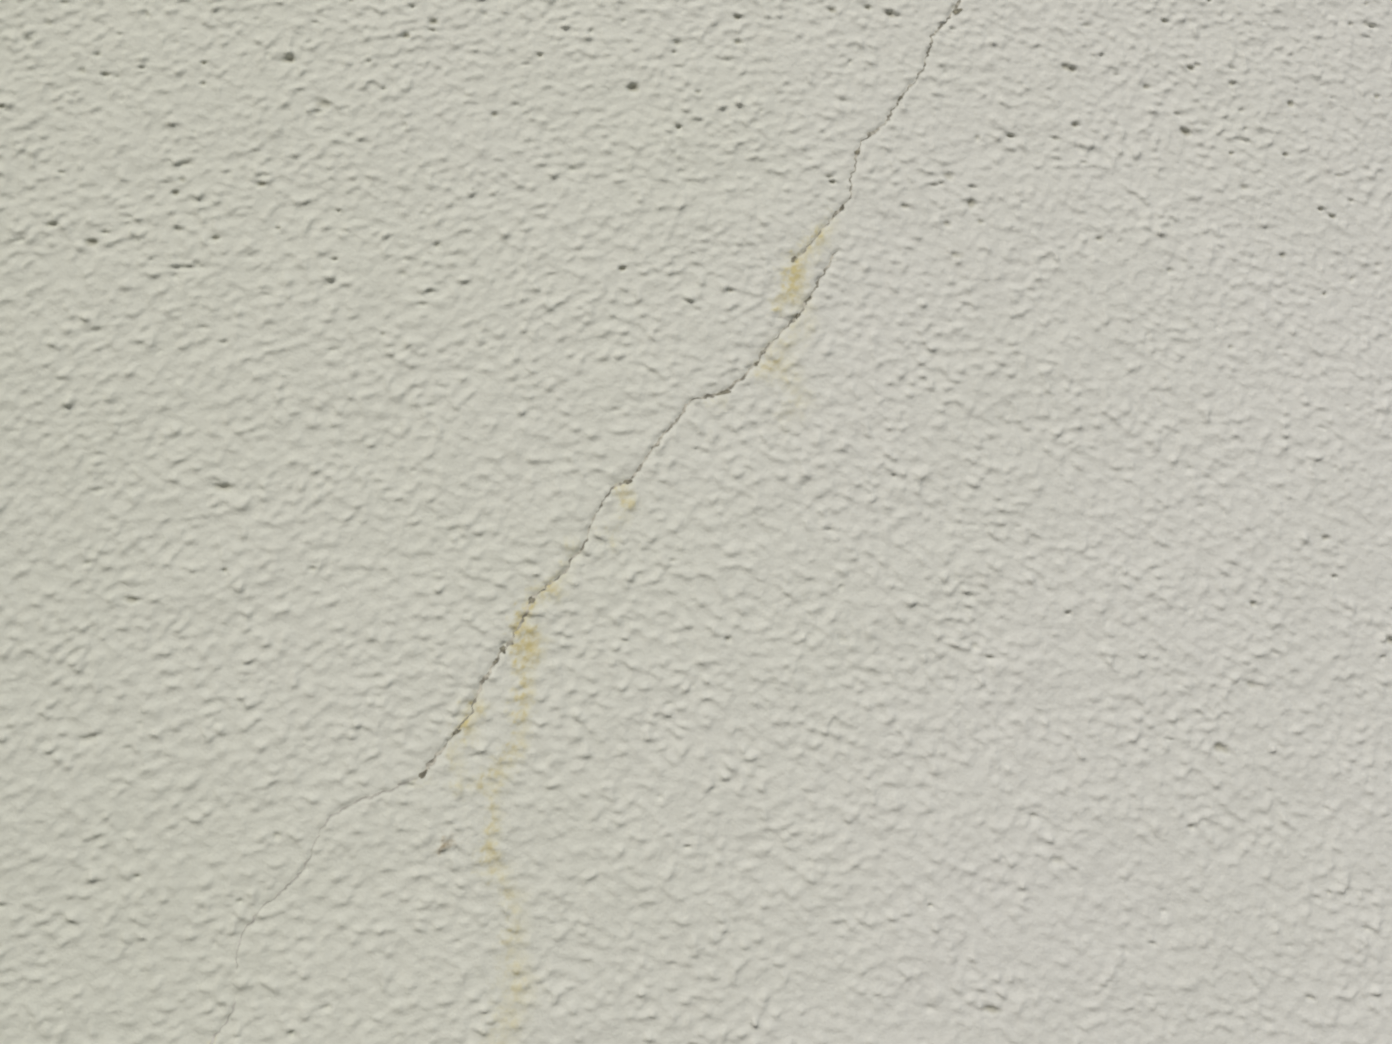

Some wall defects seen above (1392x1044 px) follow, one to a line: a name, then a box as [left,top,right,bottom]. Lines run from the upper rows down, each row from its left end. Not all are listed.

crack [210,0,962,1044]